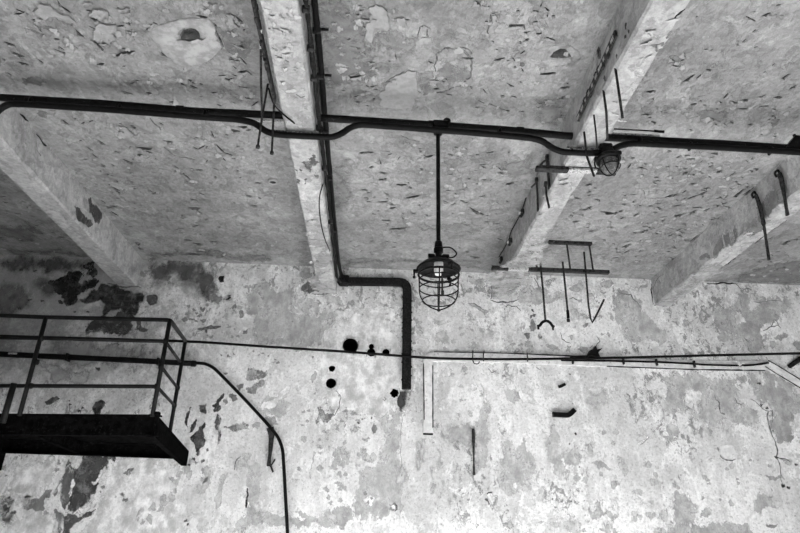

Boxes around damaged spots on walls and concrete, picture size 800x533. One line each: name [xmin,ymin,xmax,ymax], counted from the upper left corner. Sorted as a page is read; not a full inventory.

peeling [196,1,259,107]
peeling [314,0,577,125]
peeling [75,118,265,227]
peeling [149,193,278,262]
damp [1,255,87,296]
flaking render [49,261,158,345]
damp [150,261,225,304]
peeling [137,368,290,525]
crack [751,399,798,489]